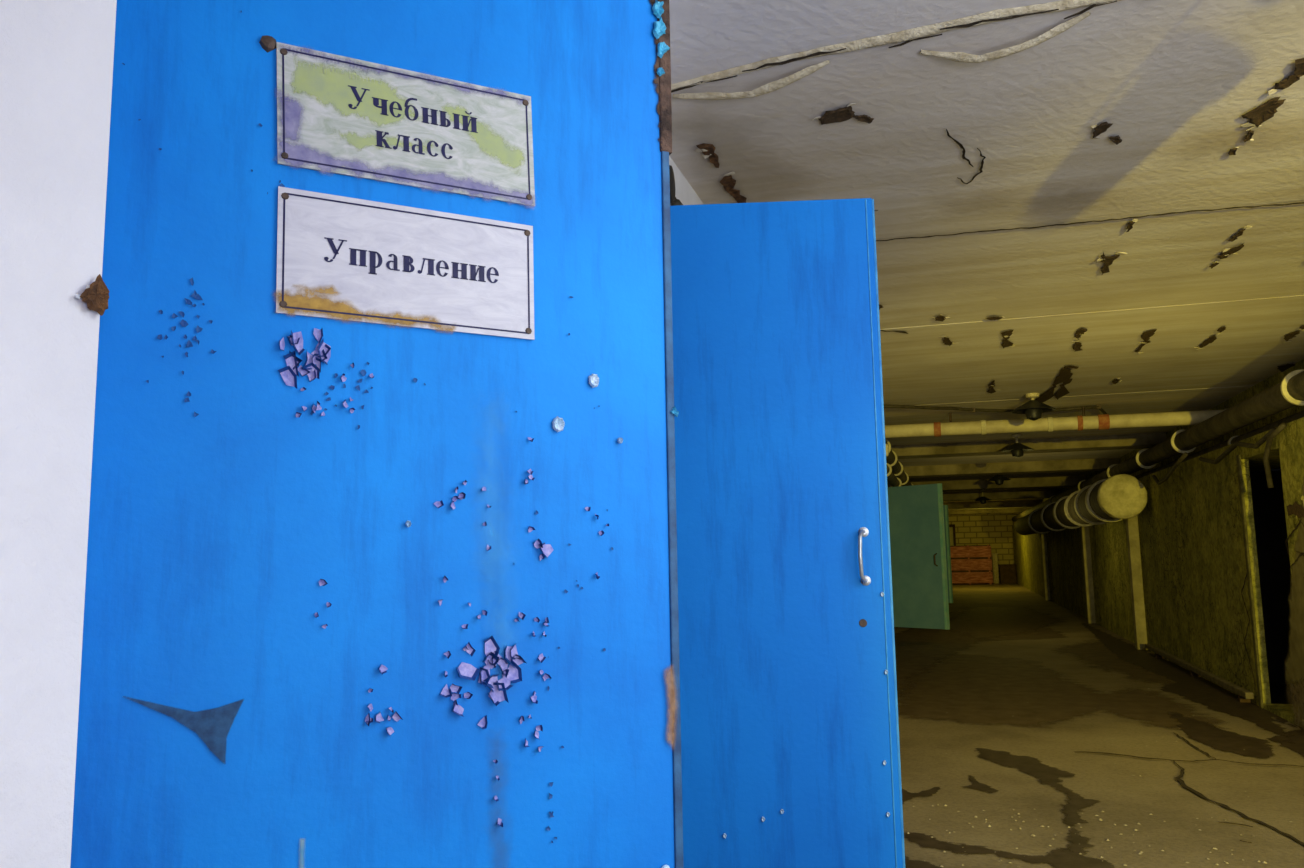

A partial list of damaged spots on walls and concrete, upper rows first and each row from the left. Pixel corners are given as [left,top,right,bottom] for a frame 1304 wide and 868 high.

corrosion [650,0,672,155]
spalling [813,103,874,125]
spalling [1228,58,1304,155]
spalling [695,143,747,203]
spalling [1097,252,1127,274]
spalling [1209,226,1252,269]
spalling [986,316,1015,349]
spalling [1035,328,1088,403]
leakage [894,480,1304,758]
corrosion [666,667,676,746]
leakage [902,748,1114,868]
crack [1080,732,1304,845]